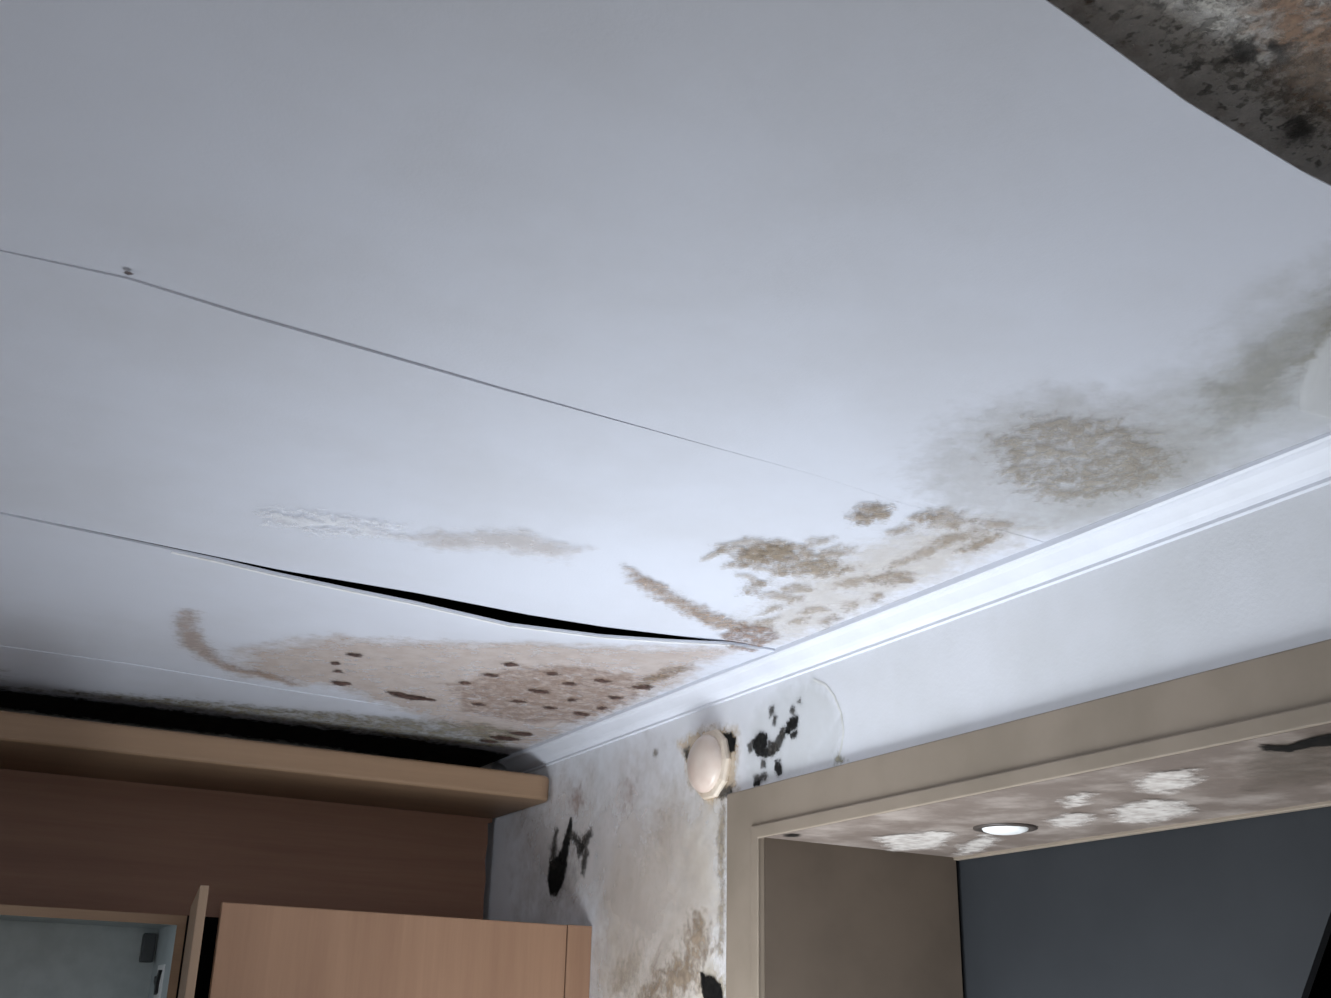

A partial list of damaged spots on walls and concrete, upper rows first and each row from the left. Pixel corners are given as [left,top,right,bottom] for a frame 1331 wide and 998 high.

damp [1085,0,1331,166]
damp [988,420,1169,499]
crack [171,551,735,647]
damp [628,568,778,652]
damp [0,687,533,768]
damp [332,653,361,686]
damp [510,667,688,717]
damp [1259,734,1331,752]
damp [547,817,592,896]
damp [605,699,801,998]